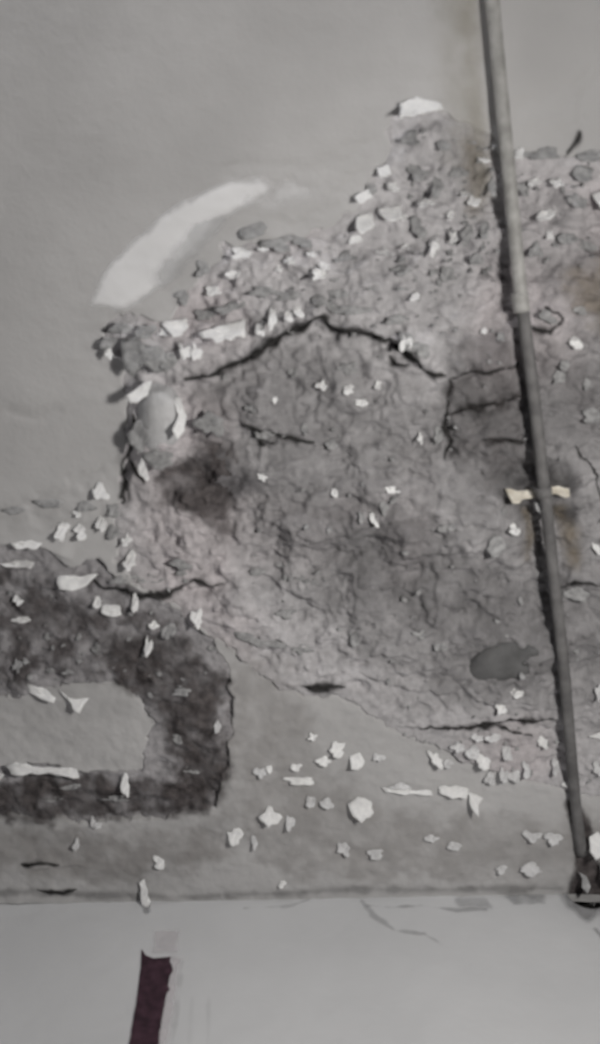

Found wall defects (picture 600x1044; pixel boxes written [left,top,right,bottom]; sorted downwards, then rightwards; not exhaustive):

spalling [0,97,600,919]
crack [184,314,528,458]